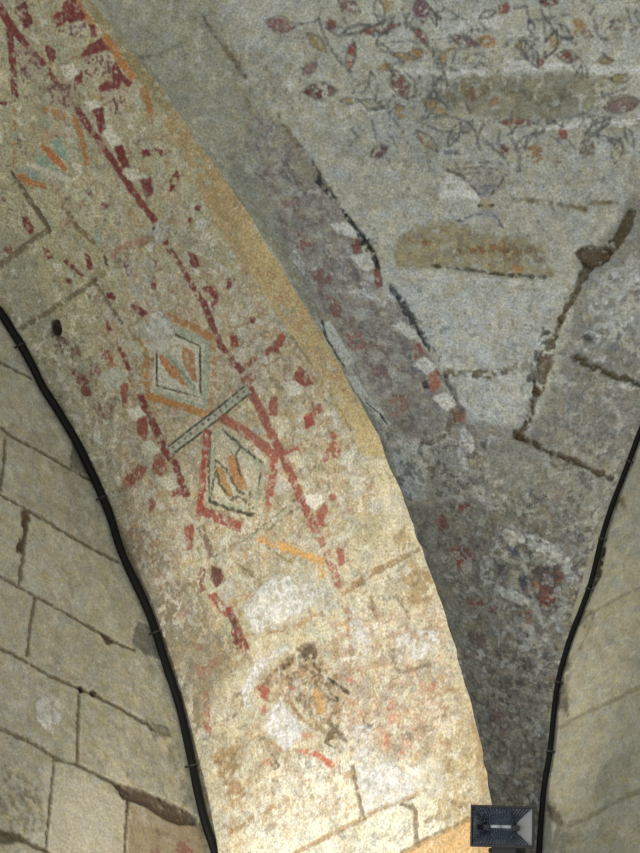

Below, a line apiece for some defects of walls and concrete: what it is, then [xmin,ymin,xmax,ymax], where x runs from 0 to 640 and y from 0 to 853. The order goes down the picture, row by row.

crack [203,16,247,77]
crack [315,170,430,350]
crack [514,198,640,481]